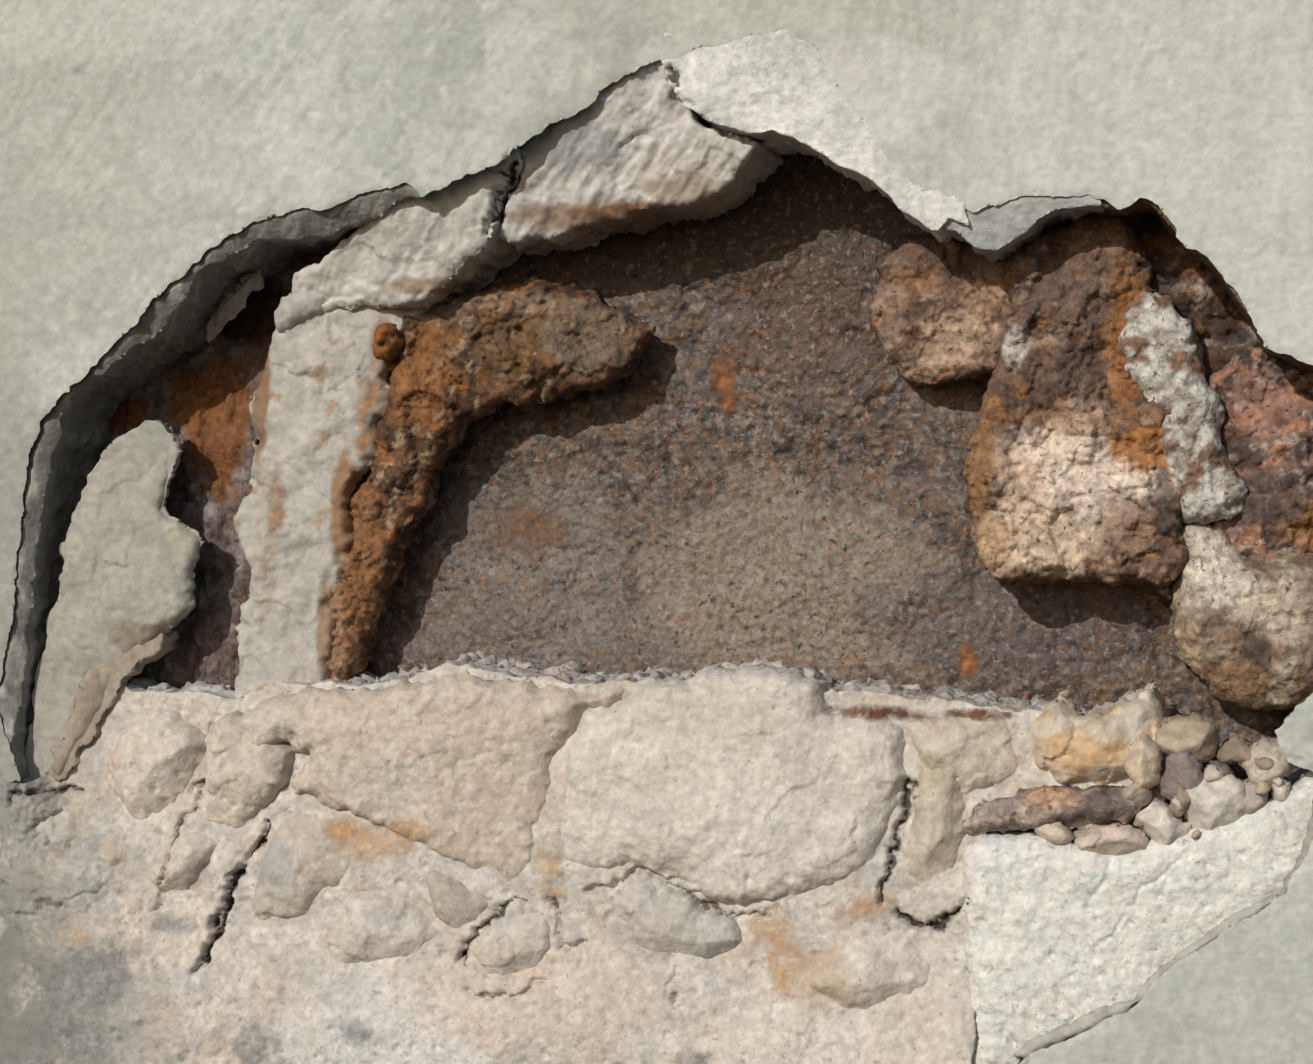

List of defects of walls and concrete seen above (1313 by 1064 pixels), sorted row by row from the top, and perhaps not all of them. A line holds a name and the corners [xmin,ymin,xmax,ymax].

spalling [661,28,1313,373]
rust [97,253,321,690]
peeling [0,183,430,783]
rust [356,374,388,451]
rust [960,213,1189,590]
crack [169,780,205,861]
crack [204,819,271,963]
crack [880,779,961,930]
peeling [962,767,1313,1064]